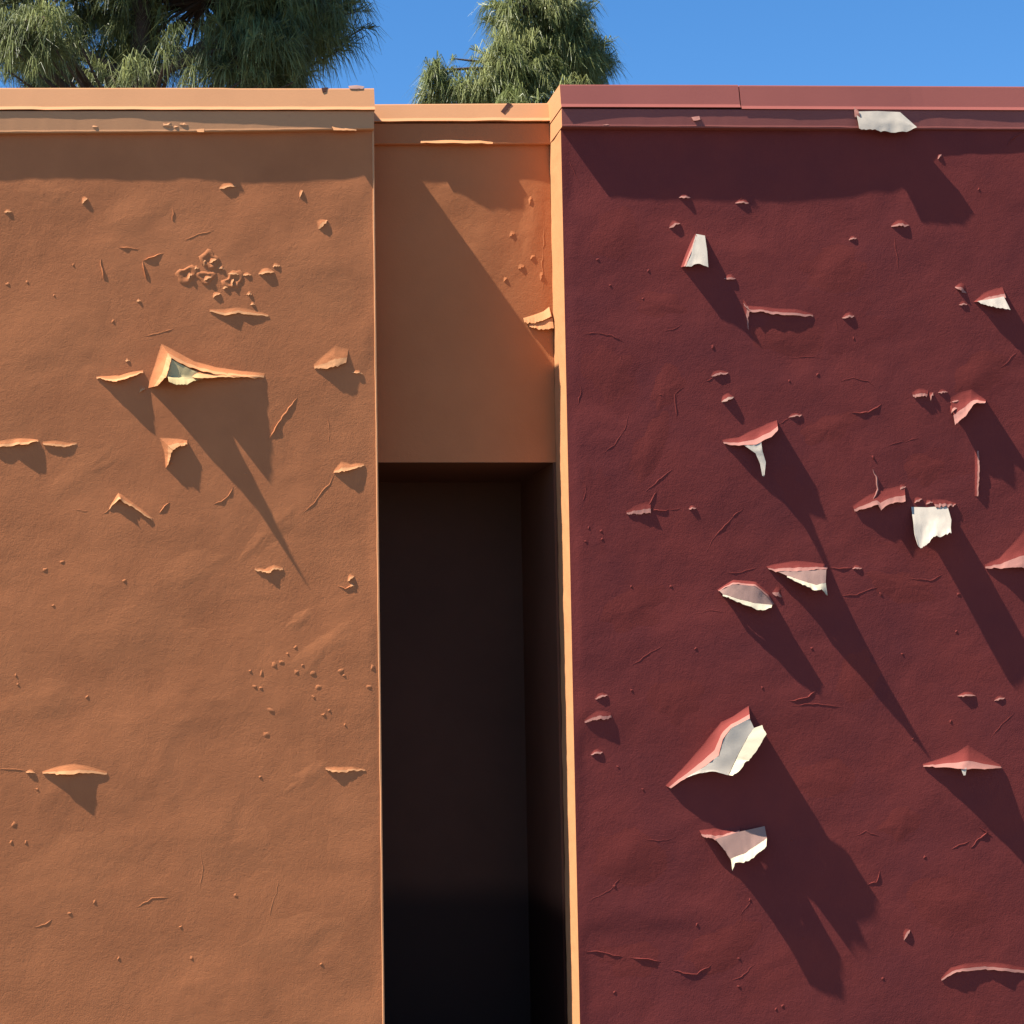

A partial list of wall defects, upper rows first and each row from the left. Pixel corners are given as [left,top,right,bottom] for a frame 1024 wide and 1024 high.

peeling [854,108,917,133]
peeling [681,234,708,267]
peeling [96,343,265,388]
peeling [912,388,986,425]
peeling [722,413,802,477]
peeling [853,484,956,548]
peeling [985,531,1024,569]
peeling [718,561,829,611]
peeling [26,763,107,775]
peeling [666,706,766,788]
peeling [923,745,1001,775]
peeling [699,826,767,871]